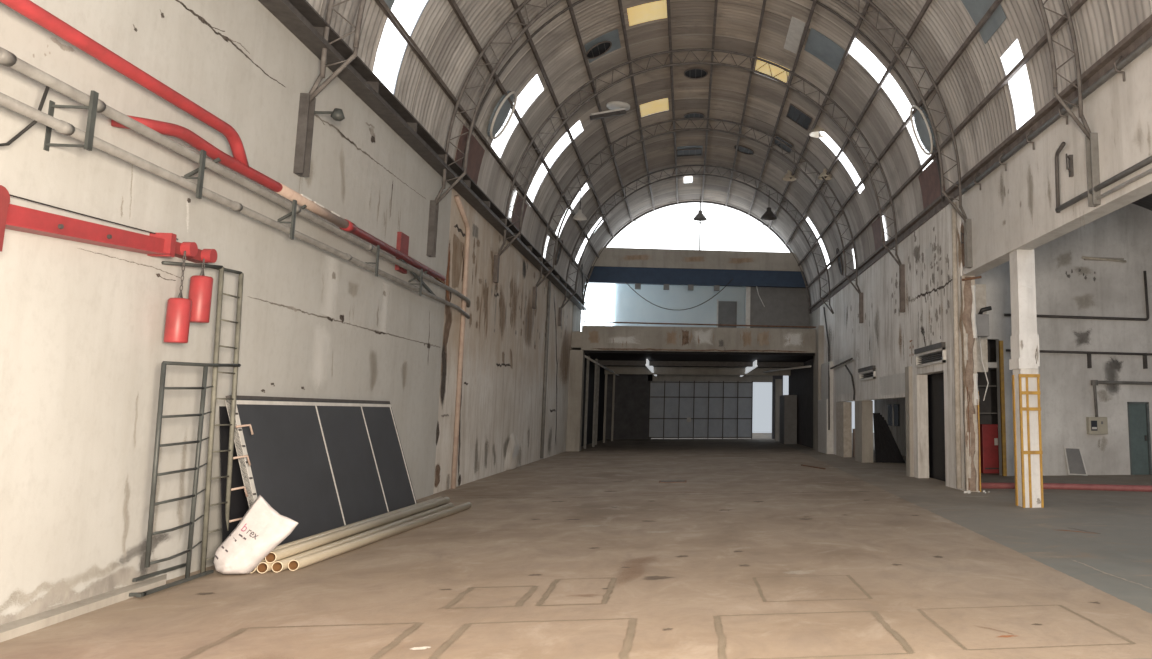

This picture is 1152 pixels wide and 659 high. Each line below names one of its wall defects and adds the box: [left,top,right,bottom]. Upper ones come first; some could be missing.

crack [176,0,285,87]
water stain [472,243,534,350]
water stain [559,331,570,385]
water stain [473,437,496,477]